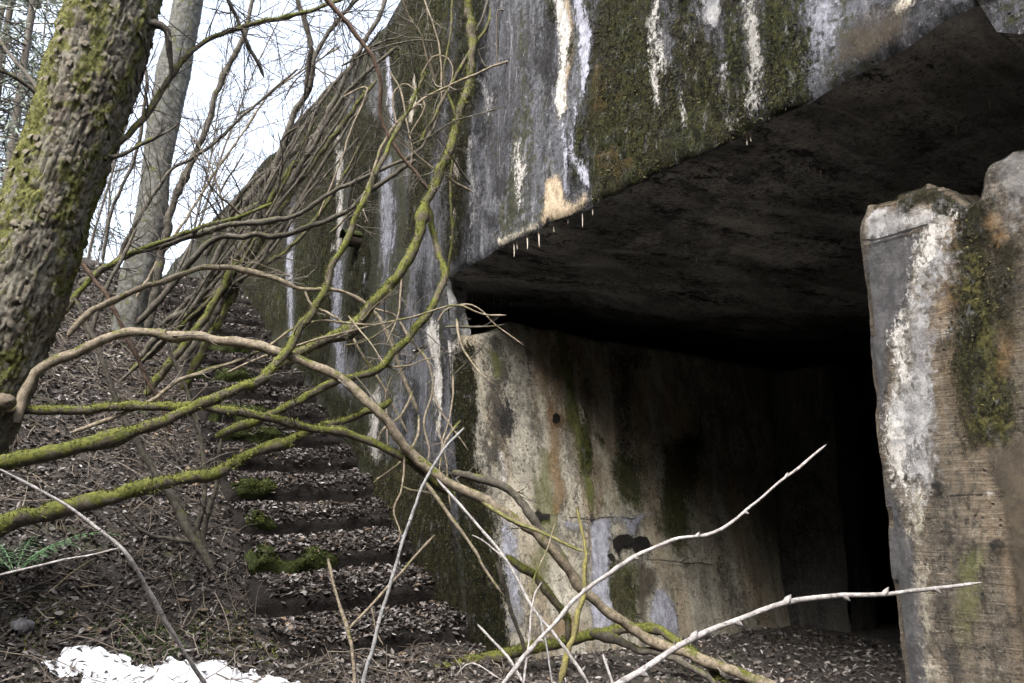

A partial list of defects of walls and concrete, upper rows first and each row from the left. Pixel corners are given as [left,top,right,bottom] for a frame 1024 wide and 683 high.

damp [531,0,592,192]
damp [647,0,667,103]
damp [702,0,720,28]
damp [742,0,763,110]
damp [285,221,294,337]
damp [330,124,345,329]
damp [378,157,396,265]
damp [453,138,528,233]
damp [333,342,346,387]
damp [475,331,518,483]
damp [865,207,967,683]